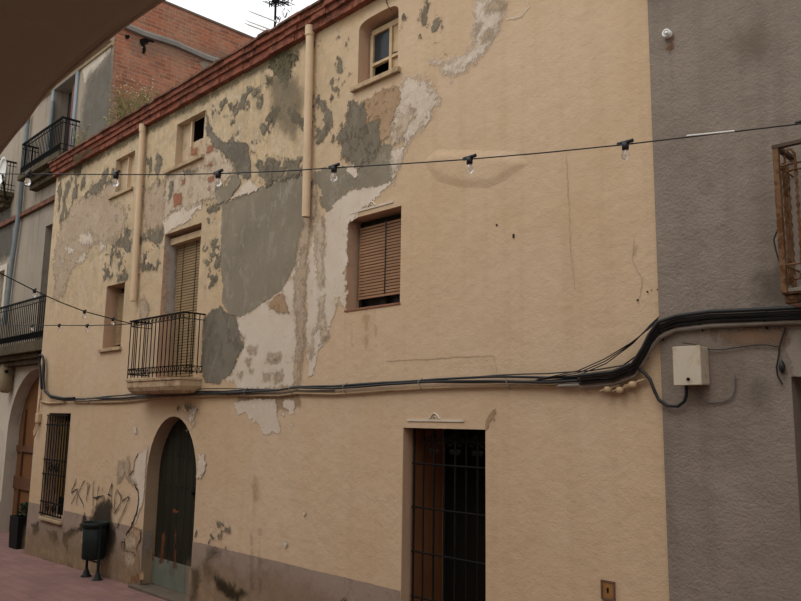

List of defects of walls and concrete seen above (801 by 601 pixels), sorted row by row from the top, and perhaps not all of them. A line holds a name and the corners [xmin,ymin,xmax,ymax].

peeling [417,0,443,38]
peeling [429,0,507,82]
peeling [210,86,263,144]
peeling [312,55,354,145]
peeling [53,182,131,300]
spalling [142,143,234,317]
peeling [226,73,441,436]
peeling [196,453,206,479]
spalling [116,448,148,584]
water stain [190,550,301,601]